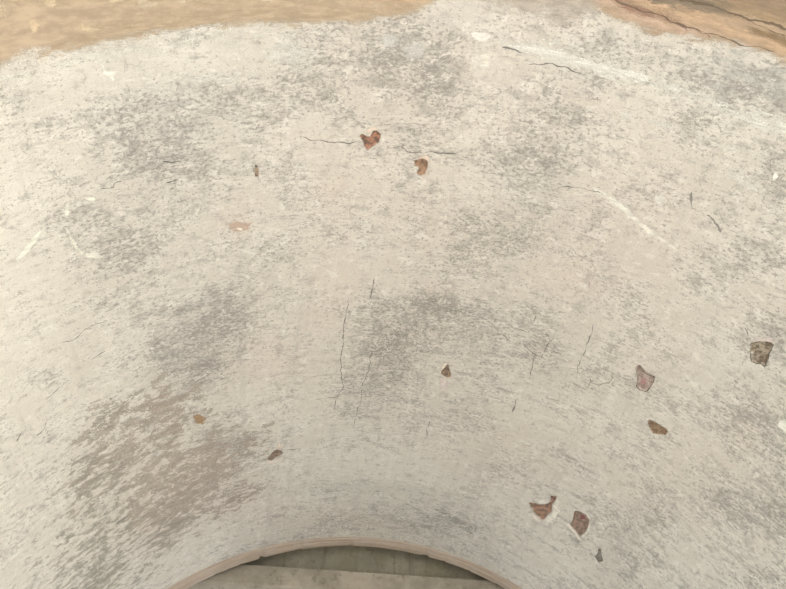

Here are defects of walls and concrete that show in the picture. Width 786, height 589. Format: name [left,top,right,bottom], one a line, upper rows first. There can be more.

crack [616,0,786,52]
damp [0,0,436,107]
crack [317,298,372,427]
spalling [528,494,560,525]
spalling [566,509,590,540]